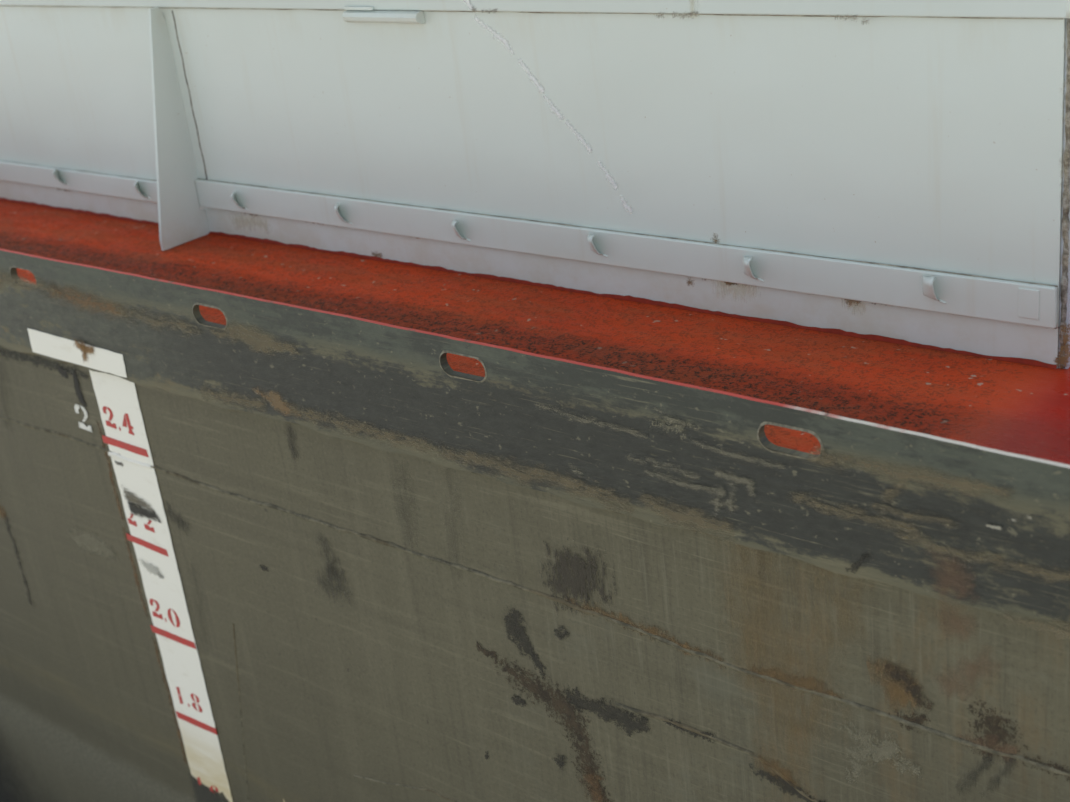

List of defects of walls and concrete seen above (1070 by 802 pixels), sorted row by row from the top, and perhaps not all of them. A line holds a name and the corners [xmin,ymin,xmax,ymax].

rust [1055,324,1070,369]
peeling [201,387,733,534]
rust [476,605,651,802]
rust [749,756,825,802]
rust [867,660,932,731]
rust [967,699,1070,782]